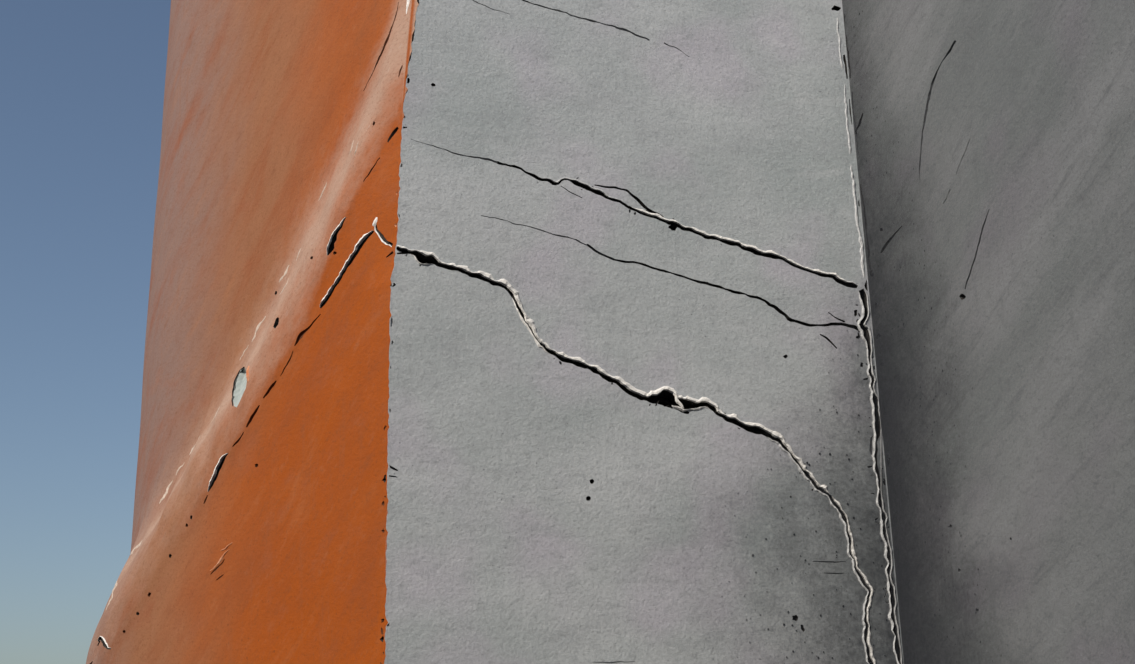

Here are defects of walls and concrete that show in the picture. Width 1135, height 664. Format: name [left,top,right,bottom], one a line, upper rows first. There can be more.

peeling [212,345,249,421]
crack [185,0,902,664]